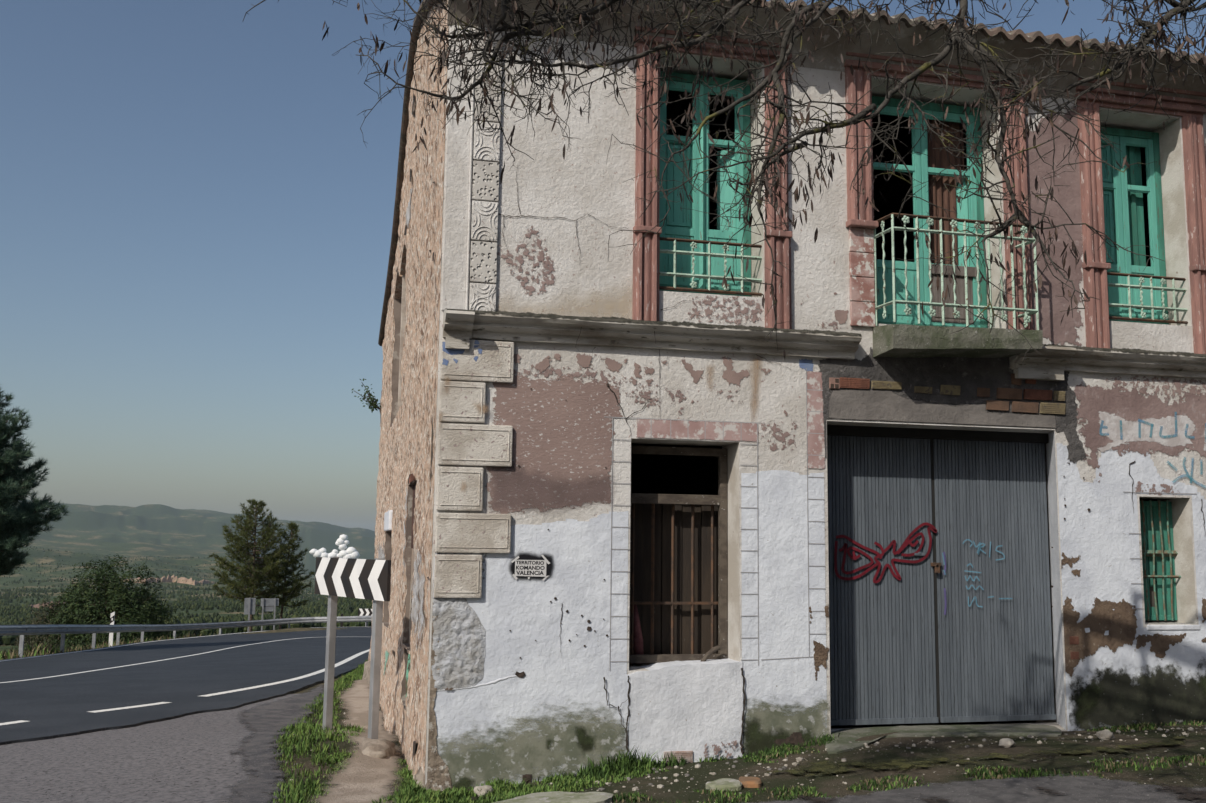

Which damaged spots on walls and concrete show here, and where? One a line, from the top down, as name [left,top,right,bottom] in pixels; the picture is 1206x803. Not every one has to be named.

crack [498,166,628,258]
peeling [497,226,556,295]
peeling [688,295,762,324]
peeling [485,353,771,514]
peeling [758,410,797,451]
peeling [986,373,1206,482]
peeling [1135,481,1180,496]
flaking render [1051,547,1081,577]
flaking render [1051,597,1186,677]
flaking render [412,576,485,791]
crack [603,676,630,752]
damp [1069,659,1206,731]